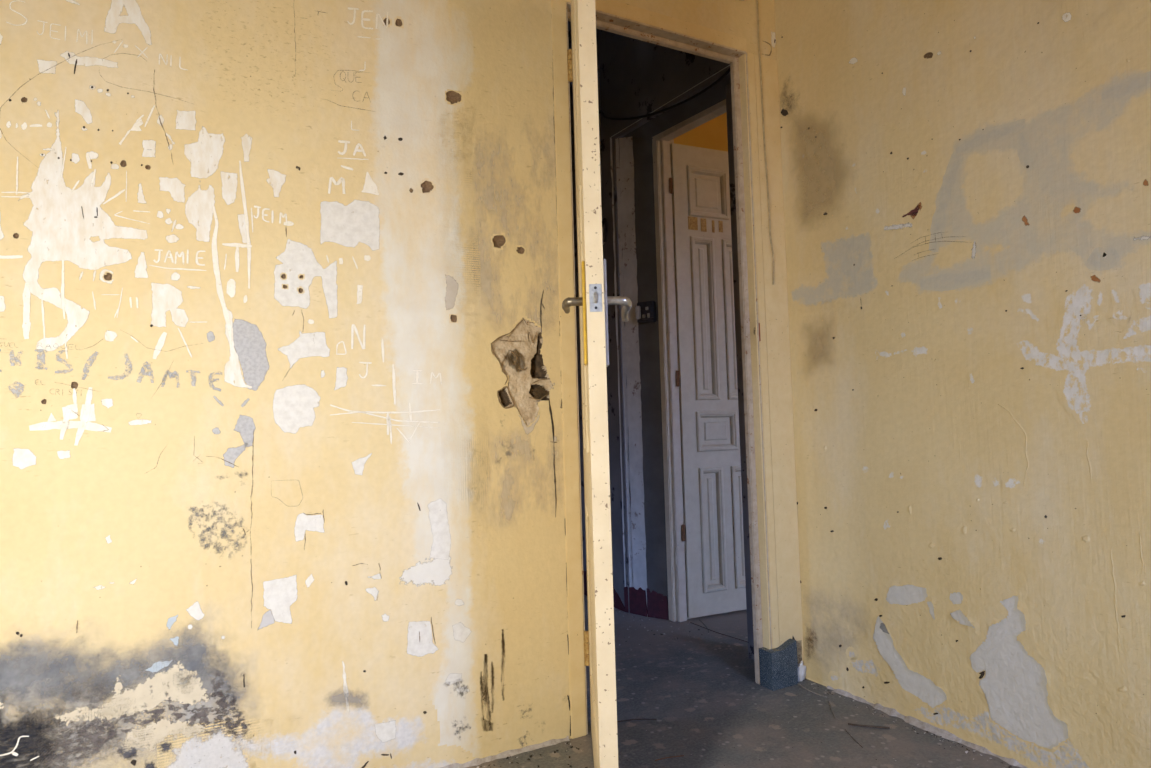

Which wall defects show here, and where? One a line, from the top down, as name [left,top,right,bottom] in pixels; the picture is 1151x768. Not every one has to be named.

peeling [72,151,98,164]
spalling [207,309,269,468]
water stain [0,0,530,768]
spalling [491,317,553,426]
peeling [874,585,935,620]
peeling [873,615,947,715]
peeling [949,592,1068,749]